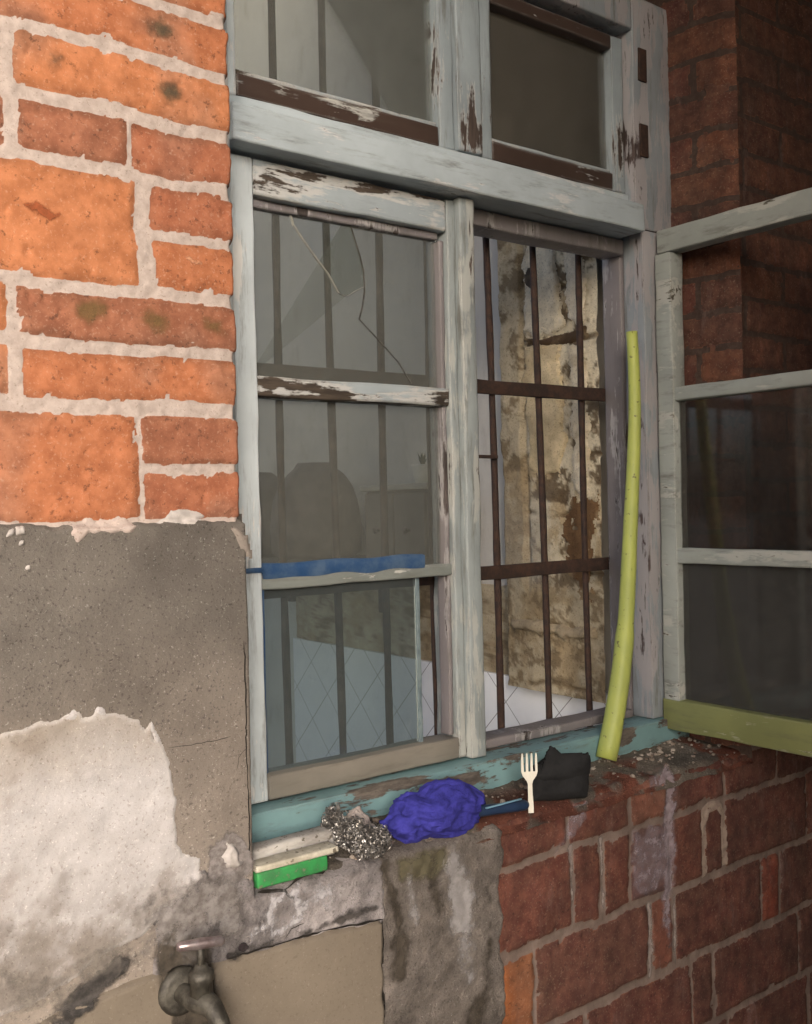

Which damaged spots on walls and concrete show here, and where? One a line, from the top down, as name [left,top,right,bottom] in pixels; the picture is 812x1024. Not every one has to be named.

rust [561,494,600,603]
leakage [2,950,136,1024]
peeling [0,707,254,1016]
leakage [155,927,216,994]
leakage [251,883,332,937]
leakage [380,860,417,982]
leakage [429,851,475,961]
leakage [467,970,488,1024]
leakage [635,766,676,977]